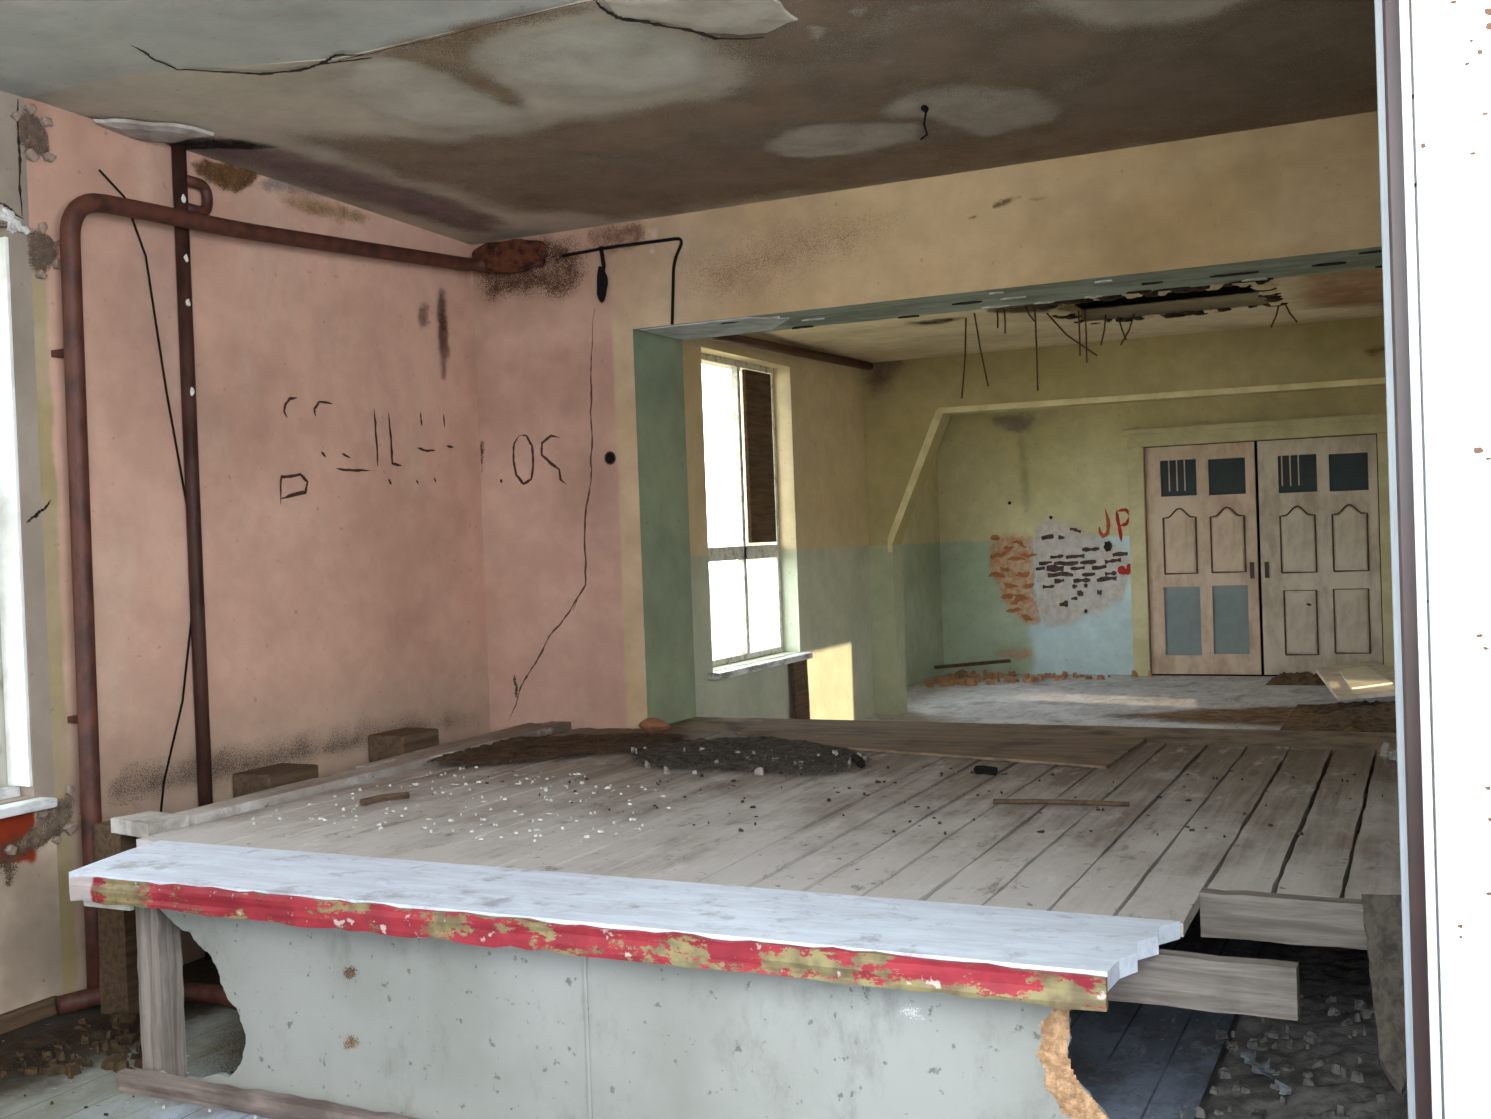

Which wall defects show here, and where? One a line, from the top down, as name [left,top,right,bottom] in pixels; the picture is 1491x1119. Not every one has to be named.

crack [131,0,604,75]
peeling [595,0,830,61]
flaking render [10,103,57,162]
damp [164,0,1378,306]
flaking render [0,202,61,279]
flaking render [1312,250,1382,268]
flaking render [952,271,1288,327]
flaking render [986,515,1131,628]
rust [342,965,360,979]